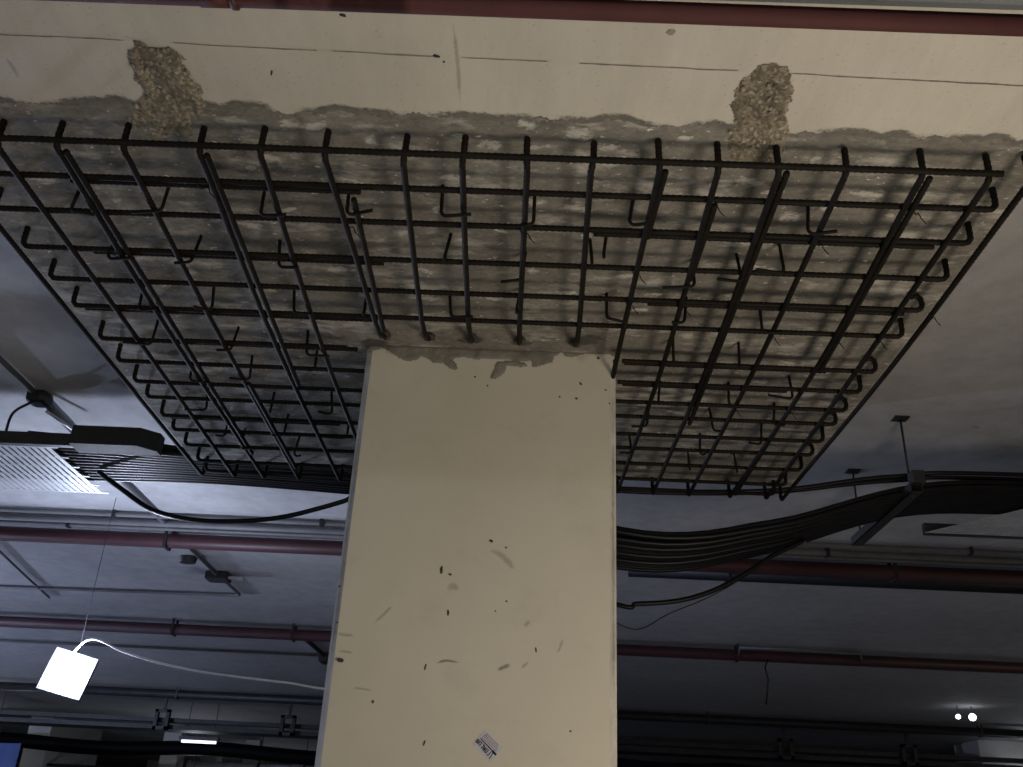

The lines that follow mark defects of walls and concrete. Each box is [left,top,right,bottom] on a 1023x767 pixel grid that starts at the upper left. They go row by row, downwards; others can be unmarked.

spalling [0,95,1023,501]